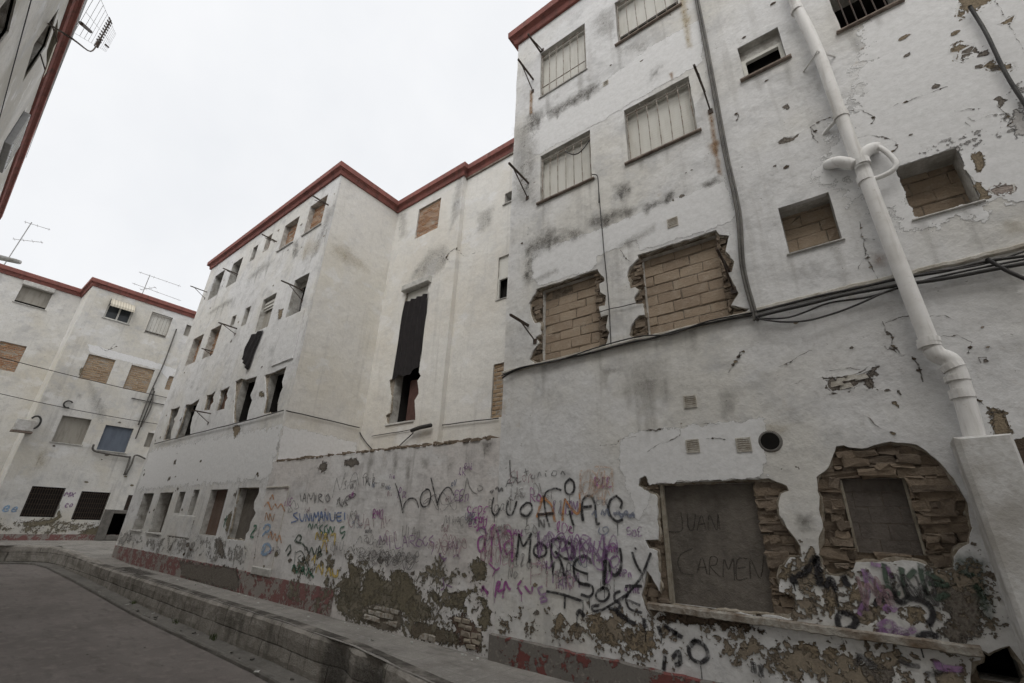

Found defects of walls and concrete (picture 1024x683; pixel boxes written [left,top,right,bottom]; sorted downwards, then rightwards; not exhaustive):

flaking render [947,0,1018,73]
flaking render [993,81,1024,139]
flaking render [919,130,1017,203]
flaking render [532,291,544,363]
flaking render [594,272,609,347]
flaking render [630,257,648,337]
flaking render [817,362,902,408]
crack [826,316,923,387]
flaking render [979,402,1024,464]
flaking render [275,445,1009,683]